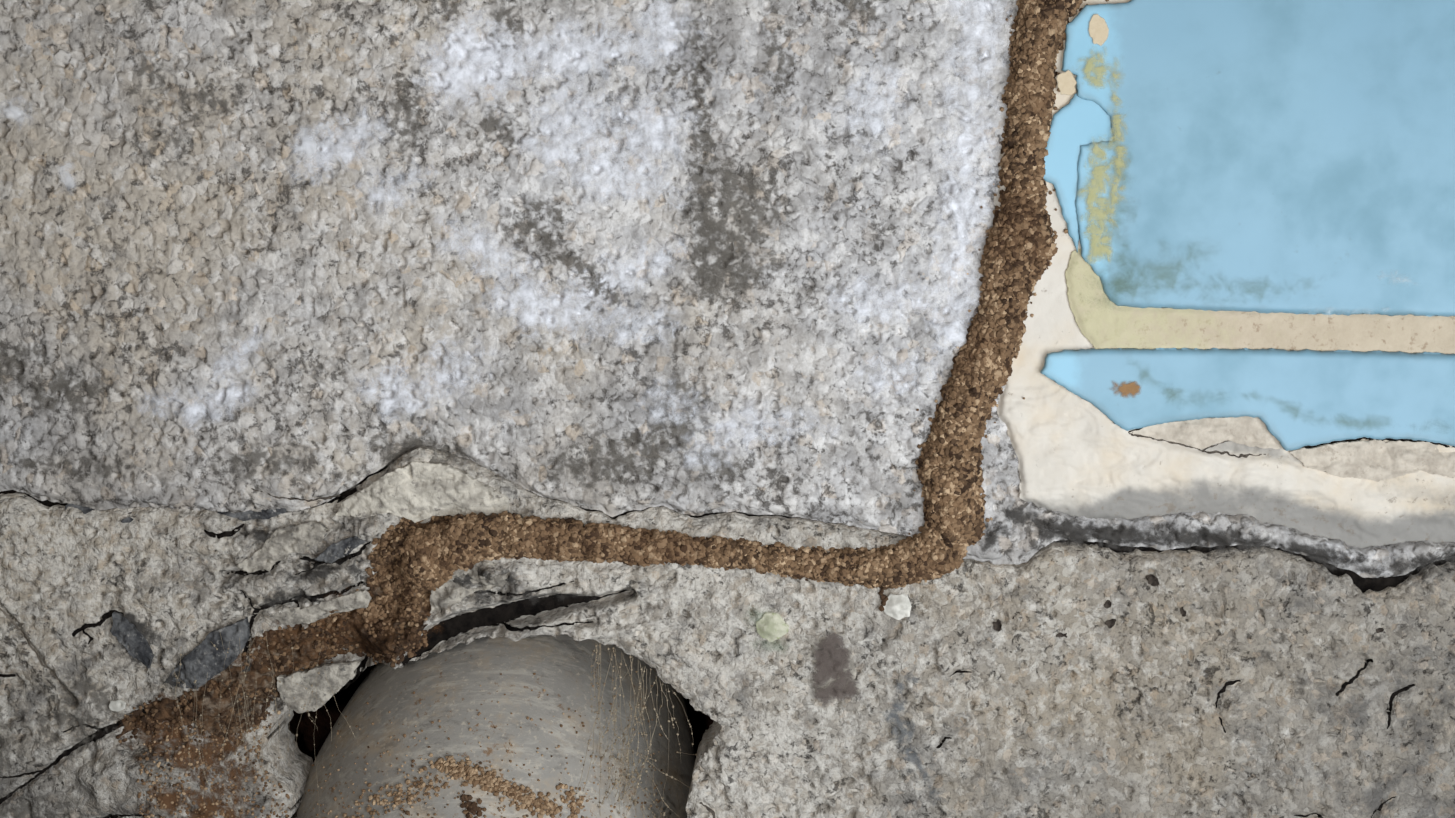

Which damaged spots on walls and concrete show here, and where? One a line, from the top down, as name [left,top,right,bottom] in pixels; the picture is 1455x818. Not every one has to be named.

leakage [130,47,243,157]
leakage [300,0,794,340]
leakage [790,0,997,347]
leakage [186,326,258,423]
leakage [535,369,789,489]
crack [1128,428,1266,458]
peeling [1129,416,1455,482]
crack [1302,437,1455,448]
crack [204,445,450,662]
crack [530,491,838,524]
crack [1053,540,1452,593]
crack [0,709,146,804]